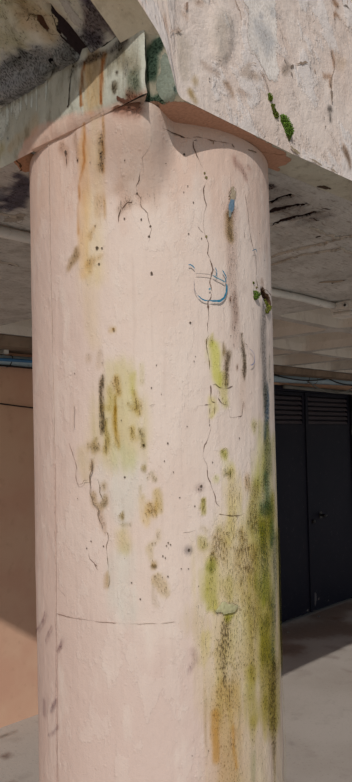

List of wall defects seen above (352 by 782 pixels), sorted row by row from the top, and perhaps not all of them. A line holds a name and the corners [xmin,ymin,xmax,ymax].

damp [0,0,108,141]
peeling [235,0,281,82]
crack [250,51,335,127]
crack [118,152,151,239]
crack [163,128,337,330]
damp [93,374,118,449]
crack [203,385,243,516]